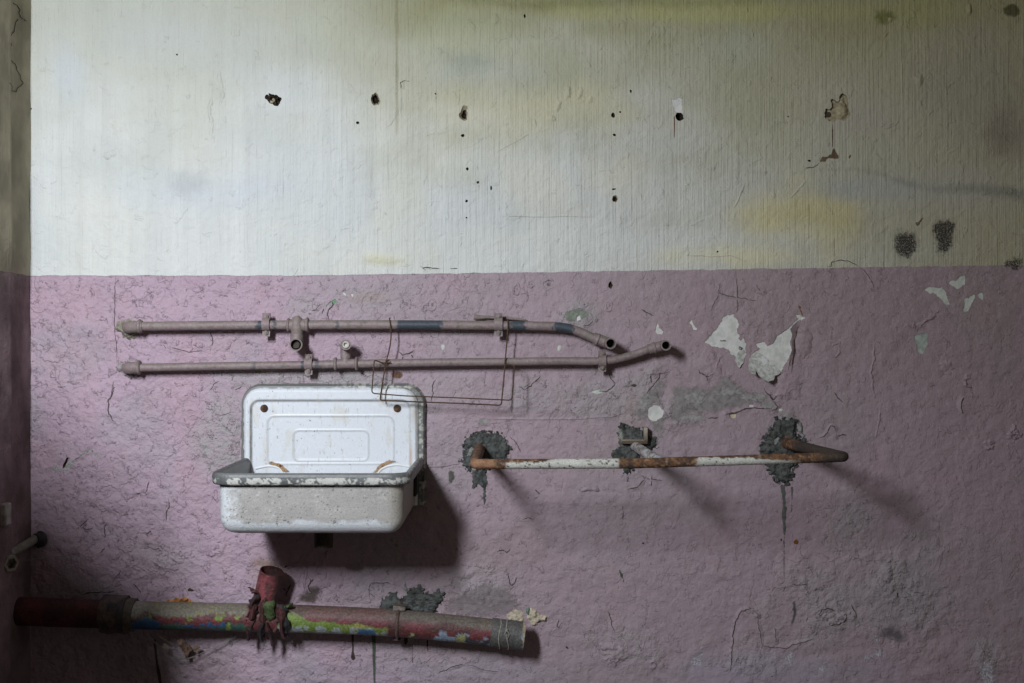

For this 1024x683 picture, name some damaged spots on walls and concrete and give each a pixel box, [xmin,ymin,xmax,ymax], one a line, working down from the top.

crack [10,3,26,92]
spalling [824,93,850,147]
rust [807,149,851,168]
damp [895,232,916,258]
damp [933,221,955,251]
peeling [924,275,983,312]
flaking render [647,306,805,423]
crack [728,605,857,674]